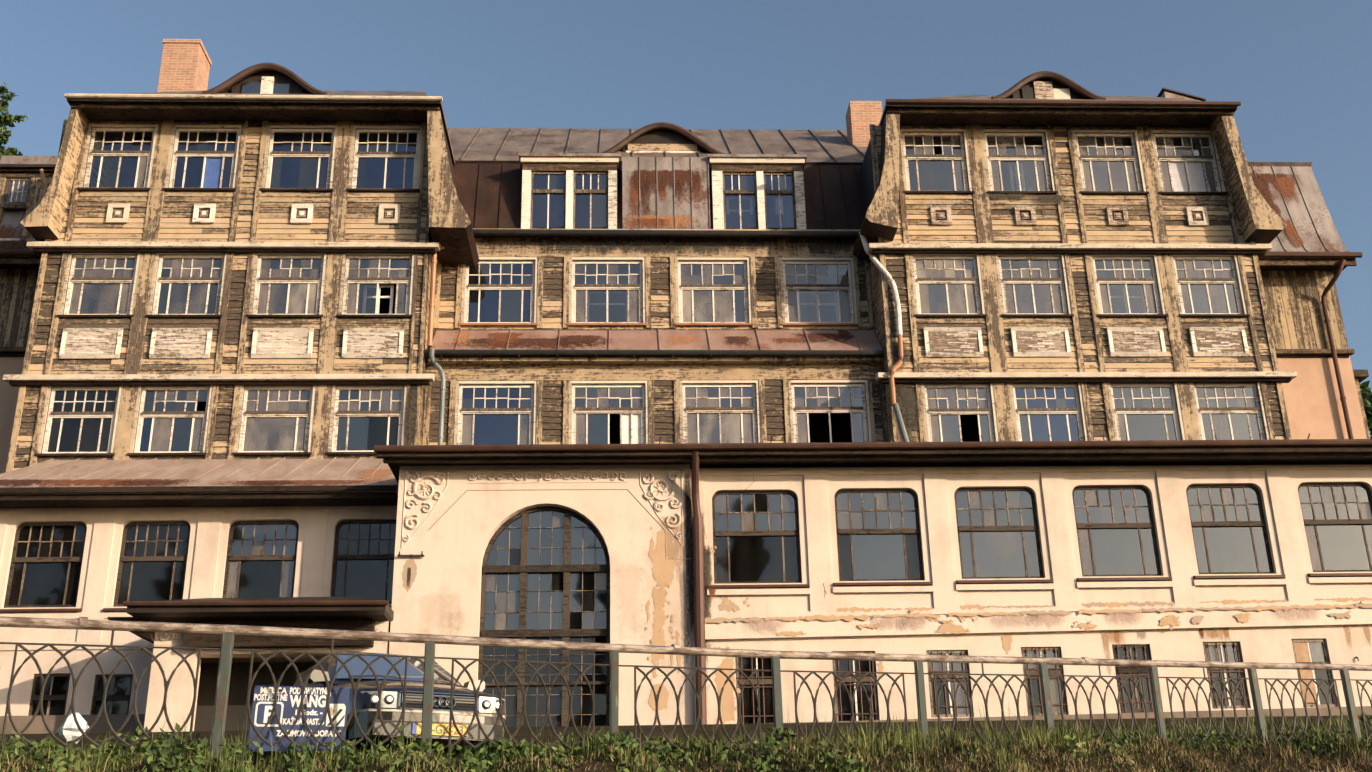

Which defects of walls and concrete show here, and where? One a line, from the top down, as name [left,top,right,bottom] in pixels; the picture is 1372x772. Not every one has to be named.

corrosion [630,170,705,229]
corrosion [1251,173,1303,247]
corrosion [0,224,30,250]
peeling [69,333,113,354]
peeling [157,333,203,354]
corrosion [455,331,605,350]
corrosion [724,336,751,347]
corrosion [773,330,853,343]
peeling [944,332,977,352]
peeling [1198,331,1240,352]
peeling [705,576,1372,637]
peeling [645,526,741,723]